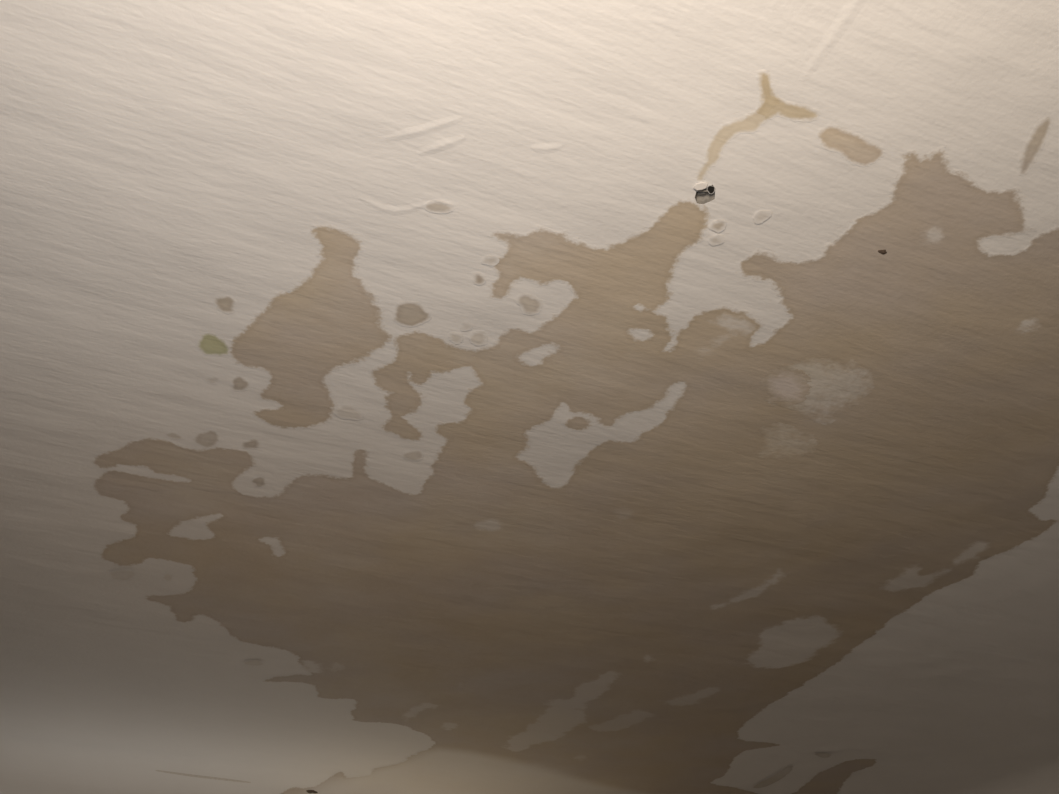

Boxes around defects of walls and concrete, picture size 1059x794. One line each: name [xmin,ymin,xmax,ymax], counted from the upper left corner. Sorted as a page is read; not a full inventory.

water stain [92,116,1059,794]